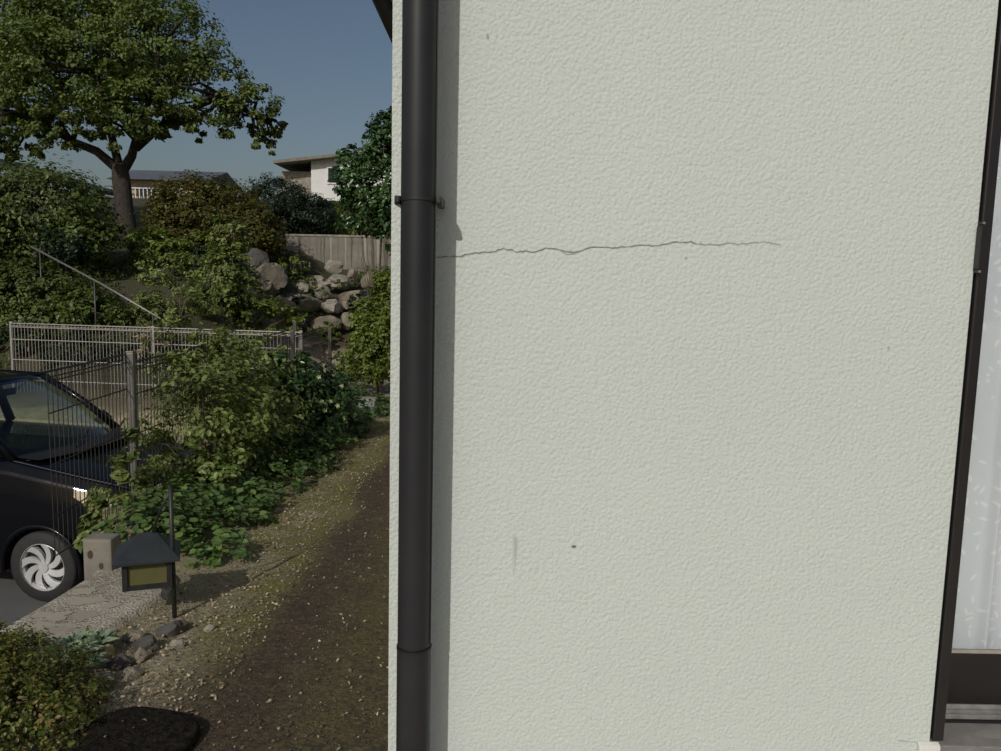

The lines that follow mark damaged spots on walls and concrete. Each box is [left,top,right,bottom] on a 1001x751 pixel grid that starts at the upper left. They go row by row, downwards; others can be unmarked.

crack [436,241,781,258]